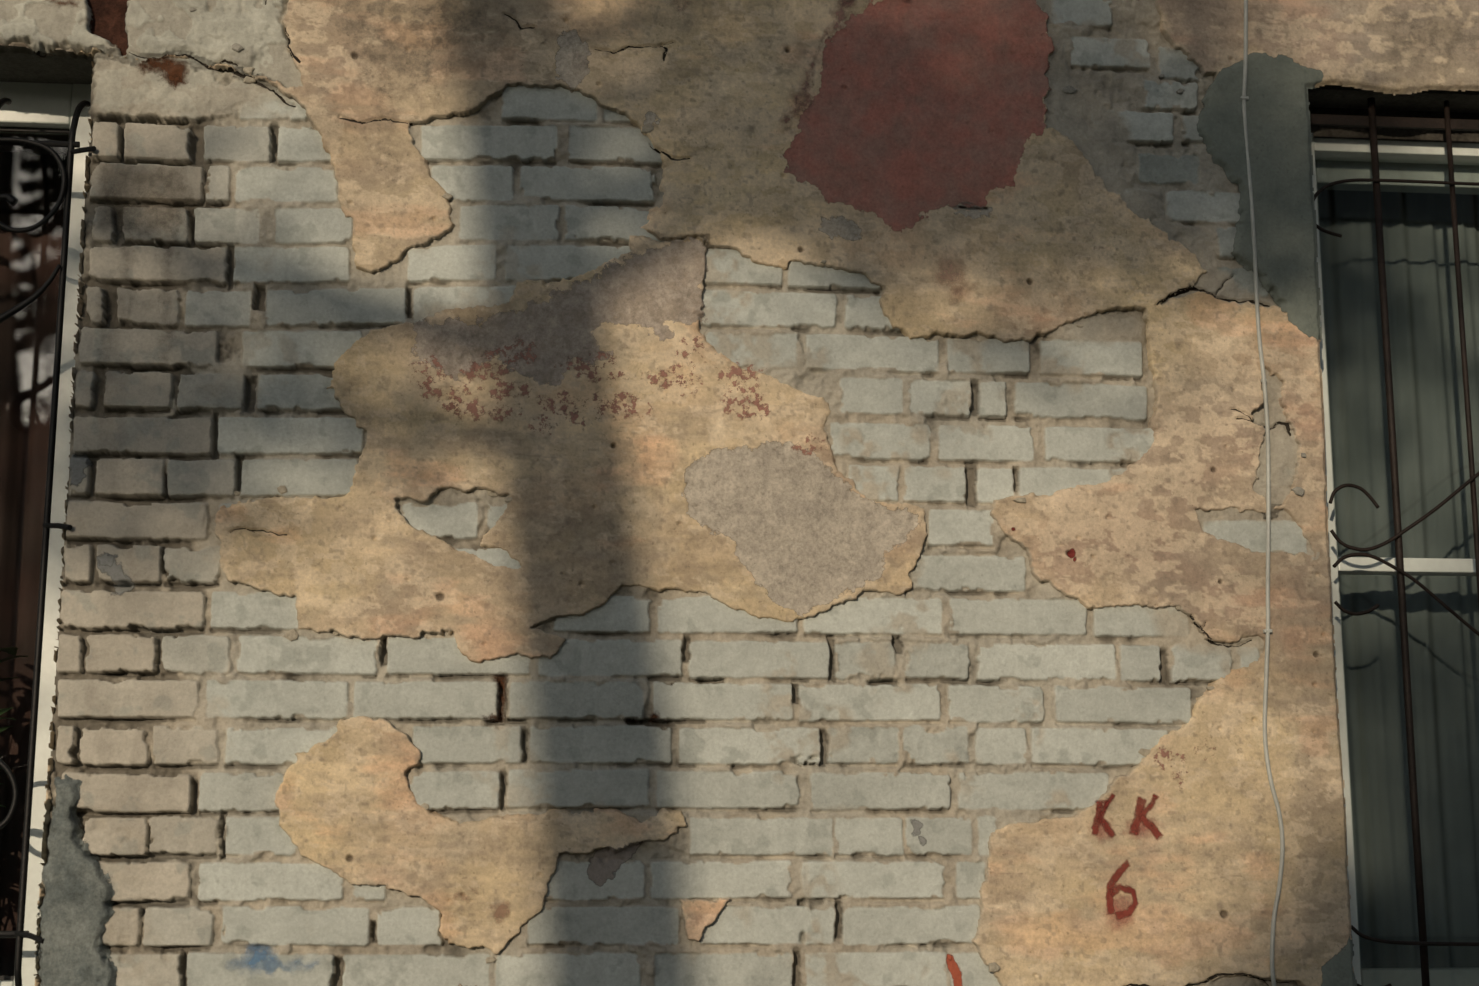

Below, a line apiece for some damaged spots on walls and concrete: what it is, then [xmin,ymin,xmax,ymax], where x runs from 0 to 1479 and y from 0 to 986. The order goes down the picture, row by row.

crack [265,0,301,63]
crack [128,52,296,107]
peeling [783,0,1278,307]
peeling [505,343,537,364]
peeling [422,376,442,399]
peeling [493,377,514,396]
flaking render [1195,369,1320,560]
peeling [1154,747,1185,770]
peeling [494,904,509,918]